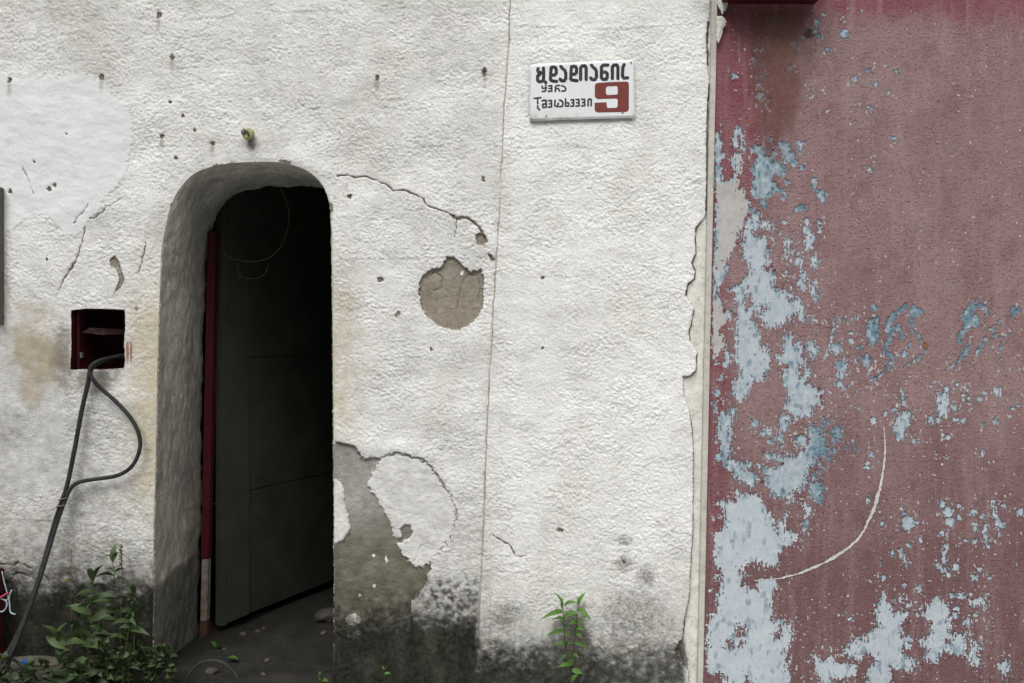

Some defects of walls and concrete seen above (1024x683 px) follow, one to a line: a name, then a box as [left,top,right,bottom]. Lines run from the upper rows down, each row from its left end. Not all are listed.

crack [58,199,120,291]
crack [337,0,527,673]
flaking render [418,233,495,331]
peeling [675,0,1024,683]
flaking render [334,442,458,627]
water stain [334,583,684,683]